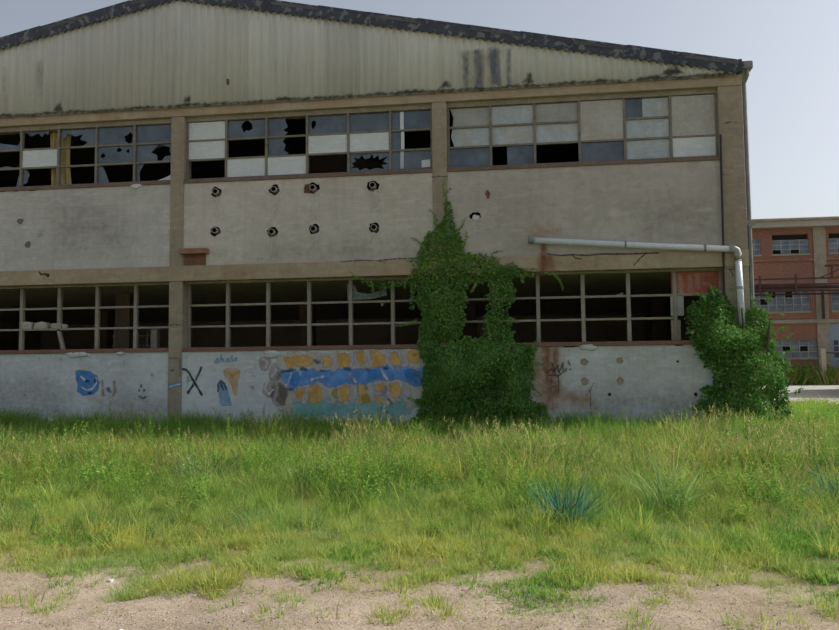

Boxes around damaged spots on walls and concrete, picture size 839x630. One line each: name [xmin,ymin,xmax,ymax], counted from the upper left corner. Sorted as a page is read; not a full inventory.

water stain [0,49,732,117]